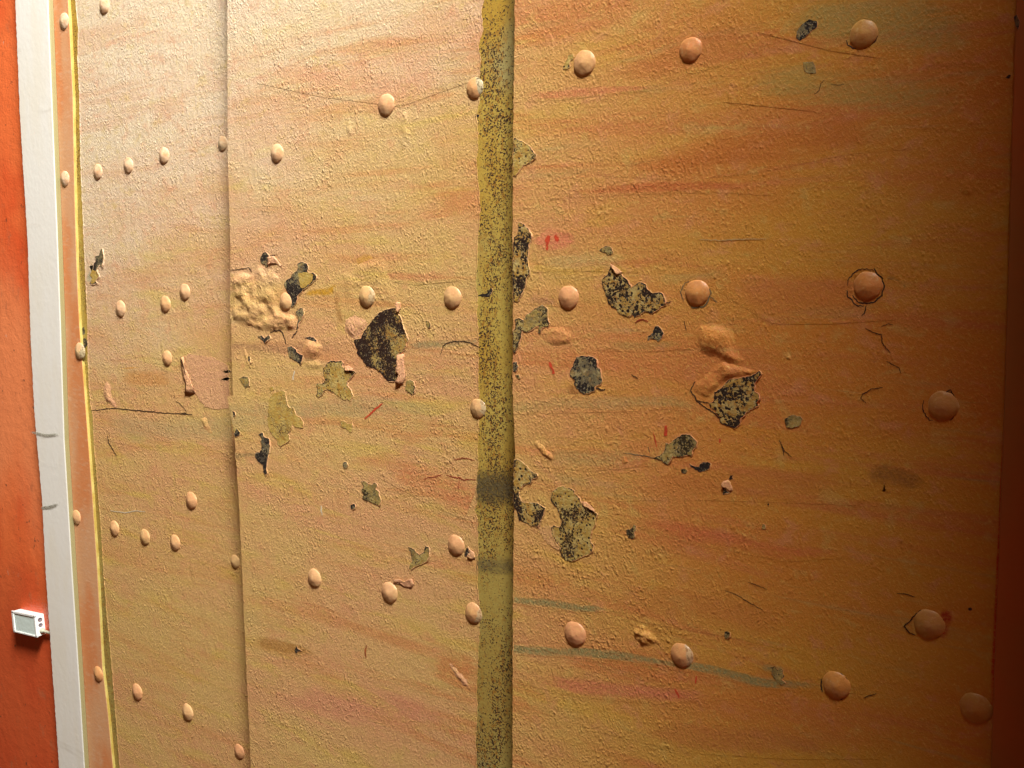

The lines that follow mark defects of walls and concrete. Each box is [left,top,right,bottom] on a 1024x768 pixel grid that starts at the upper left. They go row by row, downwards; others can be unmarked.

crack [92,401,192,415]
peeling [255,386,304,477]
peeling [284,261,318,366]
peeling [316,302,416,402]
peeling [464,0,598,768]
peeling [569,355,605,395]
peeling [599,246,671,342]
peeling [654,434,712,474]
peeling [709,370,762,429]
crack [846,268,901,403]